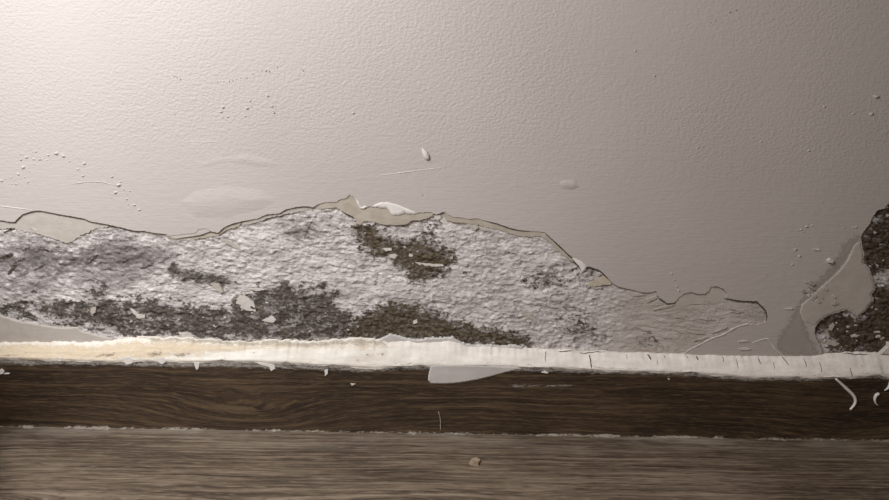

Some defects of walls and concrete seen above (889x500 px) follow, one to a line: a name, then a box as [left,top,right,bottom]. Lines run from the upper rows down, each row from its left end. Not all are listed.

water stain [0,243,149,272]
water stain [167,262,237,286]
water stain [0,281,534,360]
peeling [0,195,766,354]
mould [350,219,457,284]
crack [545,233,767,320]
peeling [777,202,889,356]
water stain [815,204,889,353]